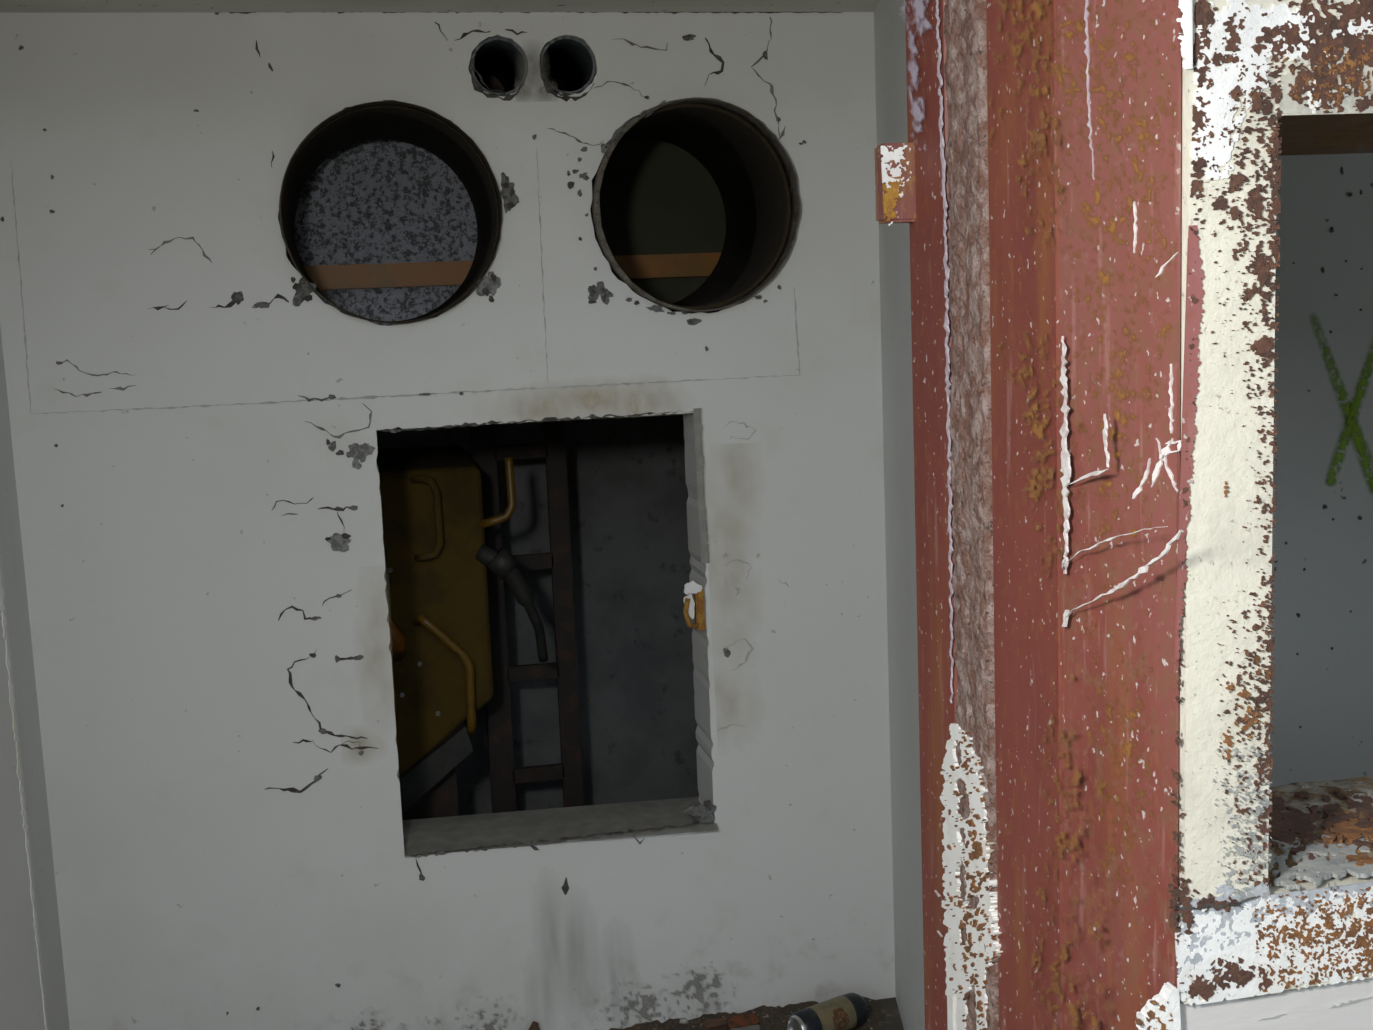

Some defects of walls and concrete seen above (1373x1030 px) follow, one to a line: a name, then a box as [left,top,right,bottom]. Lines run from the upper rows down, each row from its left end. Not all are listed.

crack [272,498,358,528]
crack [11,128,800,440]
spalling [476,271,502,302]
spalling [500,172,519,213]
crack [221,12,843,139]
spalling [567,100,666,197]
corrosion [1009,334,1070,577]
corrosion [997,0,1174,250]
corrosion [1069,219,1170,537]
corrosion [1133,0,1373,1030]
crack [264,590,379,793]
corrosion [1043,683,1152,882]